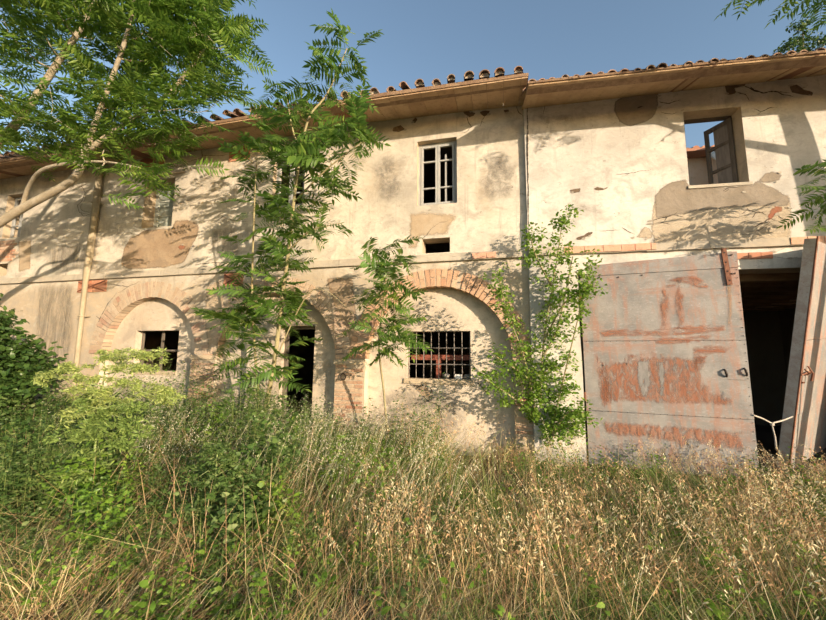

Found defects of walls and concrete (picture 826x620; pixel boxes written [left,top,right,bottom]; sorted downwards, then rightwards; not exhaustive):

crack [737,86,793,115]
flaking render [0,240,33,271]
flaking render [121,220,200,271]
flaking render [405,209,455,248]
flaking render [564,195,826,253]
crack [742,208,792,235]